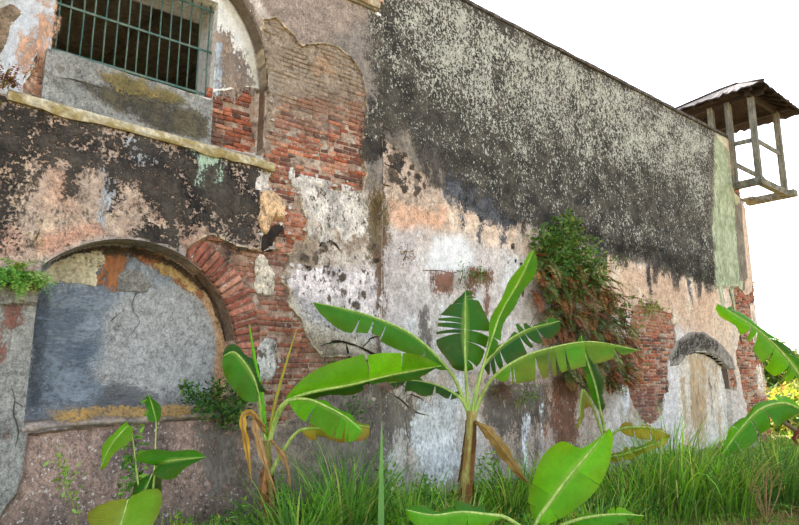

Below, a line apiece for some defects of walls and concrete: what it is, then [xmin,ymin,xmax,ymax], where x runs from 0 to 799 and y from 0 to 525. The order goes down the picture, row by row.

peeling [0,4,24,53]
spalling [23,57,44,98]
peeling [41,250,105,286]
damp [0,81,267,291]
peeling [154,262,198,292]
spalling [185,19,385,427]
damp [358,127,407,185]
damp [414,140,528,247]
damp [646,252,662,294]
damp [671,203,748,311]
spalling [625,299,676,424]
spalling [726,281,772,446]